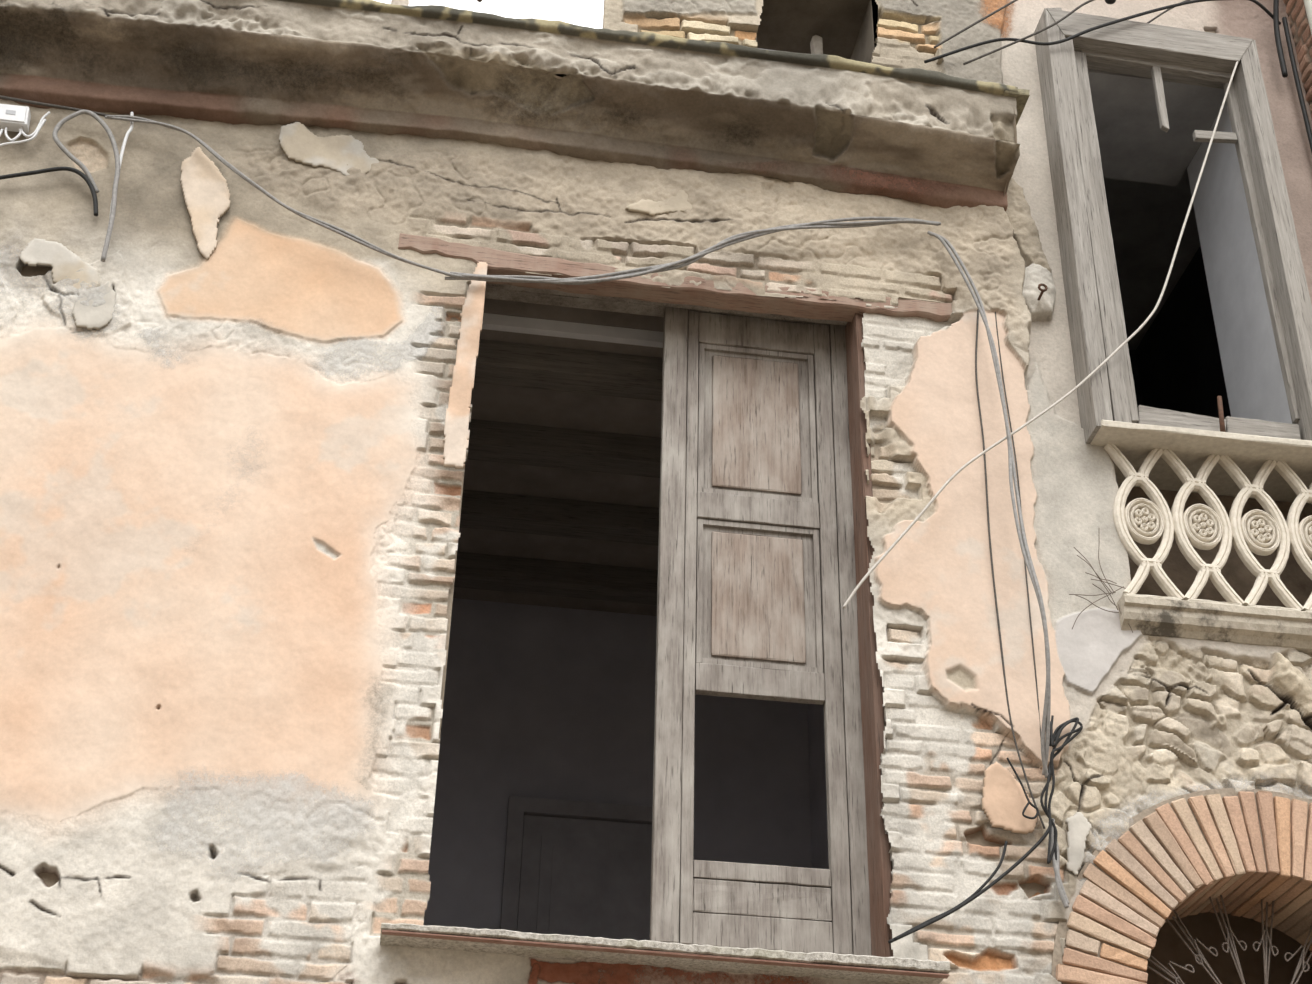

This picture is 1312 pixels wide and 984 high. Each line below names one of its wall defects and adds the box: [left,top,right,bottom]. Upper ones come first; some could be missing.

spalling [623,2,757,48]
flaking render [625,190,692,216]
flaking render [158,147,402,343]
flaking render [0,213,1312,984]
crack [0,864,130,916]